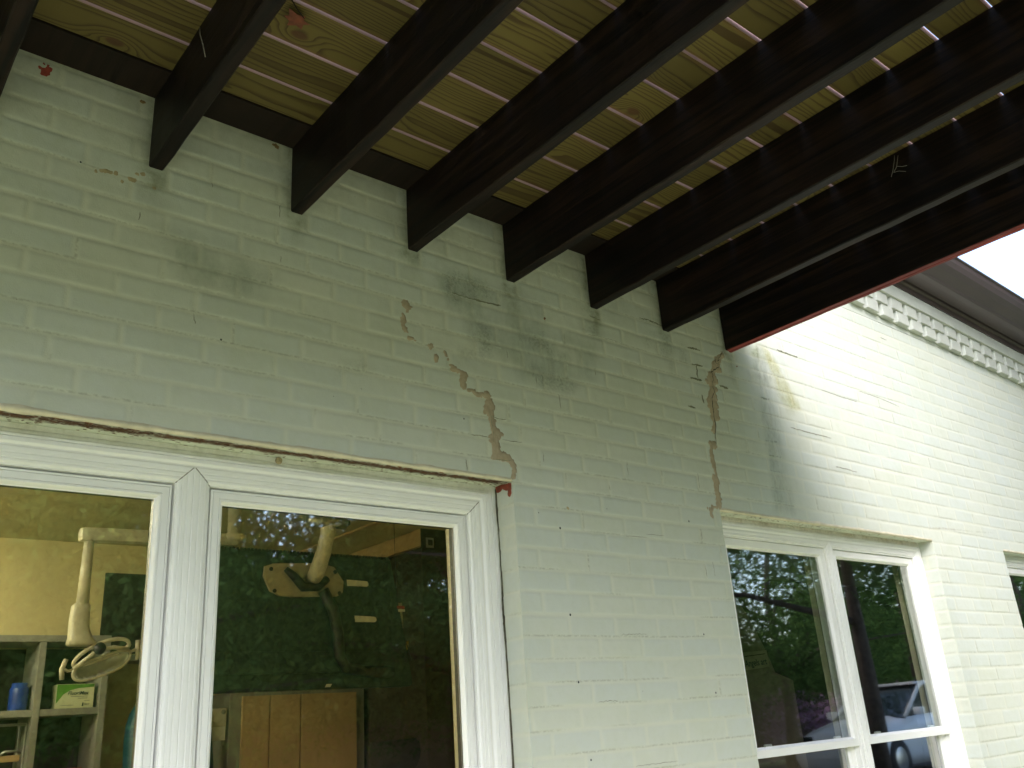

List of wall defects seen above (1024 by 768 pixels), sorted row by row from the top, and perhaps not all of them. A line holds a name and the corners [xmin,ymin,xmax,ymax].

rust [0,410,508,487]
crack [400,299,521,768]
crack [688,347,728,539]